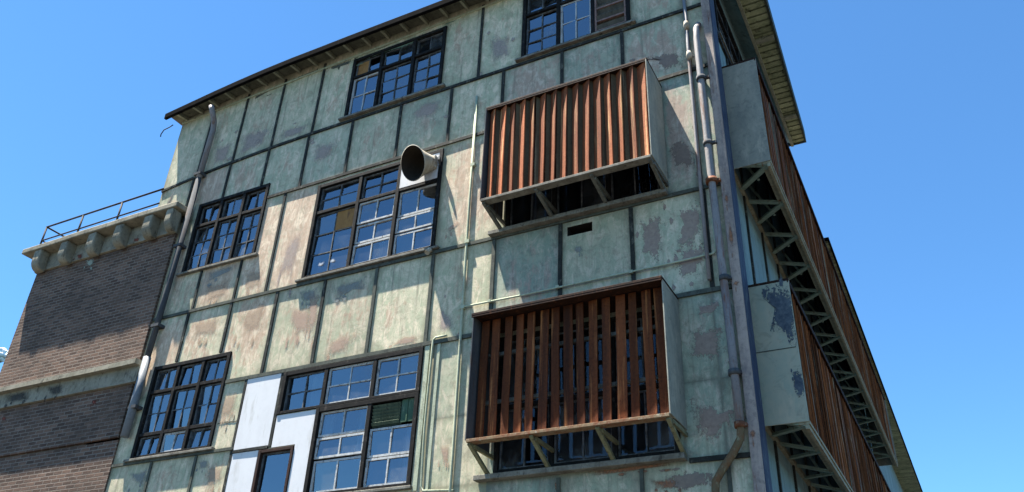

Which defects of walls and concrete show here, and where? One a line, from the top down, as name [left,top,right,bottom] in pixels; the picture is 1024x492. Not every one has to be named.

peeling [636,202,705,290]
peeling [761,276,797,346]
peeling [791,368,804,397]